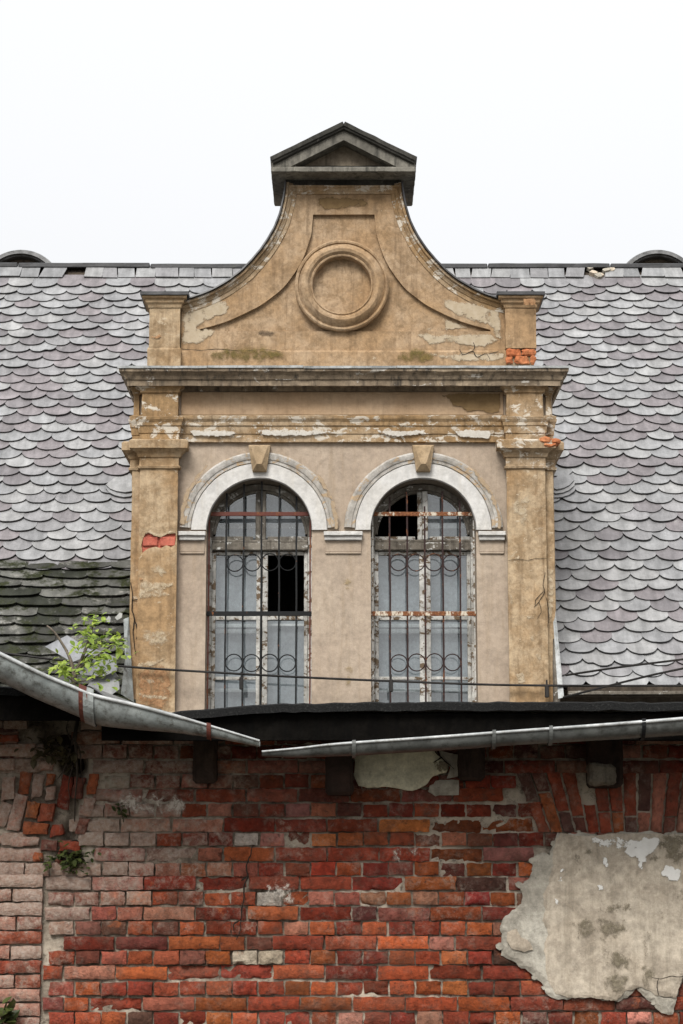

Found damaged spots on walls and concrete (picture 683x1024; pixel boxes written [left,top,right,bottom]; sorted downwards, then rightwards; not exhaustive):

flaking render [182,301,229,344]
flaking render [419,299,536,365]
peeling [455,429,491,439]
spalling [539,436,561,447]
spalling [143,465,207,547]
crack [508,558,549,628]
peeling [428,751,459,796]
damp [119,792,184,814]
peeling [591,837,660,869]
peeling [661,865,681,881]